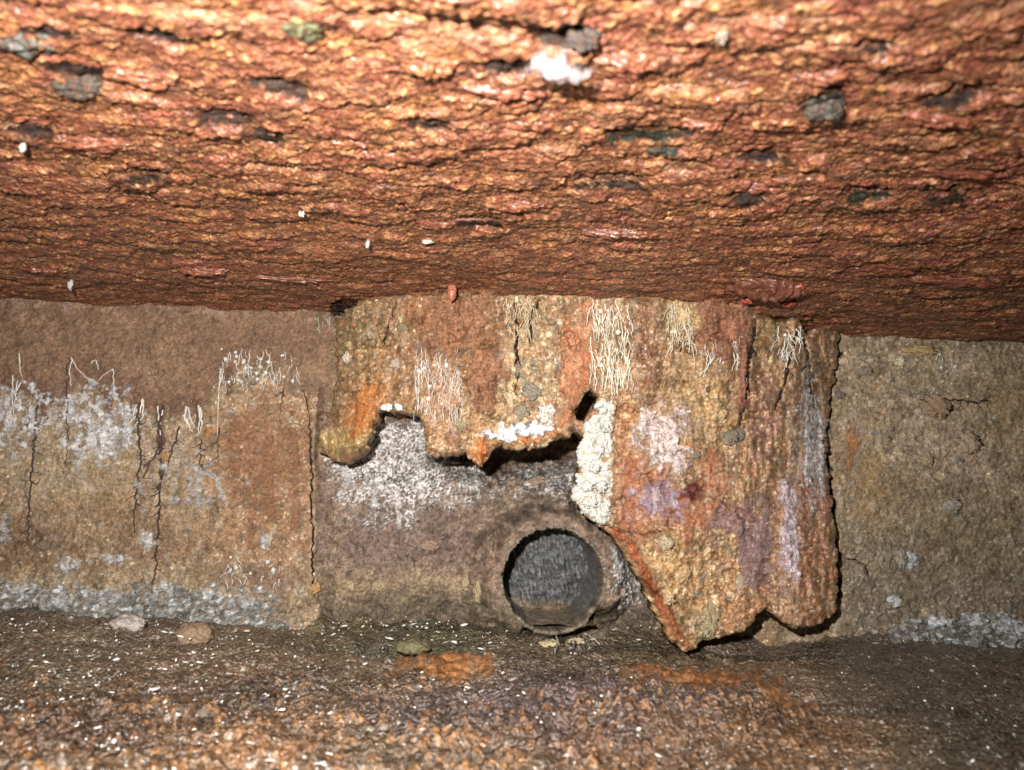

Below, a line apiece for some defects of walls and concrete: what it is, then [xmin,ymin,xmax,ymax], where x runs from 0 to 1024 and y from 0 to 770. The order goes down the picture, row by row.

rust [740,11,802,42]
rust [459,83,547,102]
rust [591,51,665,74]
rust [792,68,854,88]
rust [580,228,659,239]
water stain [0,298,336,494]
water stain [139,530,153,551]
water stain [170,449,225,517]
crack [302,389,315,597]
spalling [314,411,655,642]
water stain [324,398,693,529]
water stain [0,557,289,630]